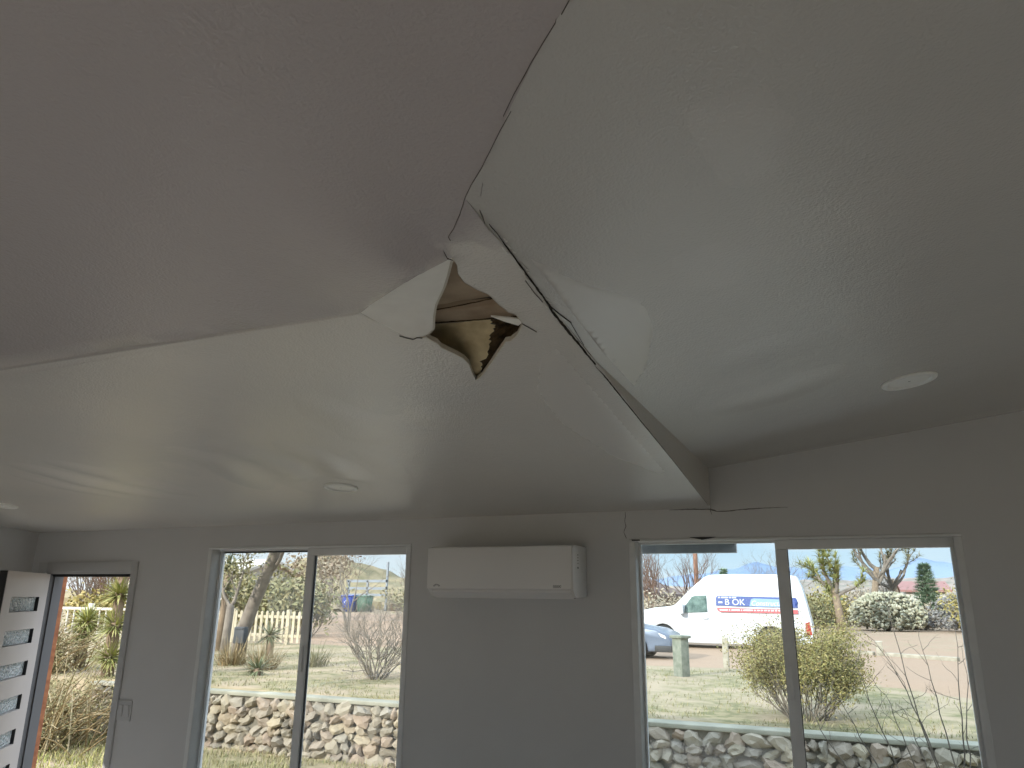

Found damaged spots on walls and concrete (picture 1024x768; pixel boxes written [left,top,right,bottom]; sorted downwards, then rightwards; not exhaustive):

crack [443,0,782,514]